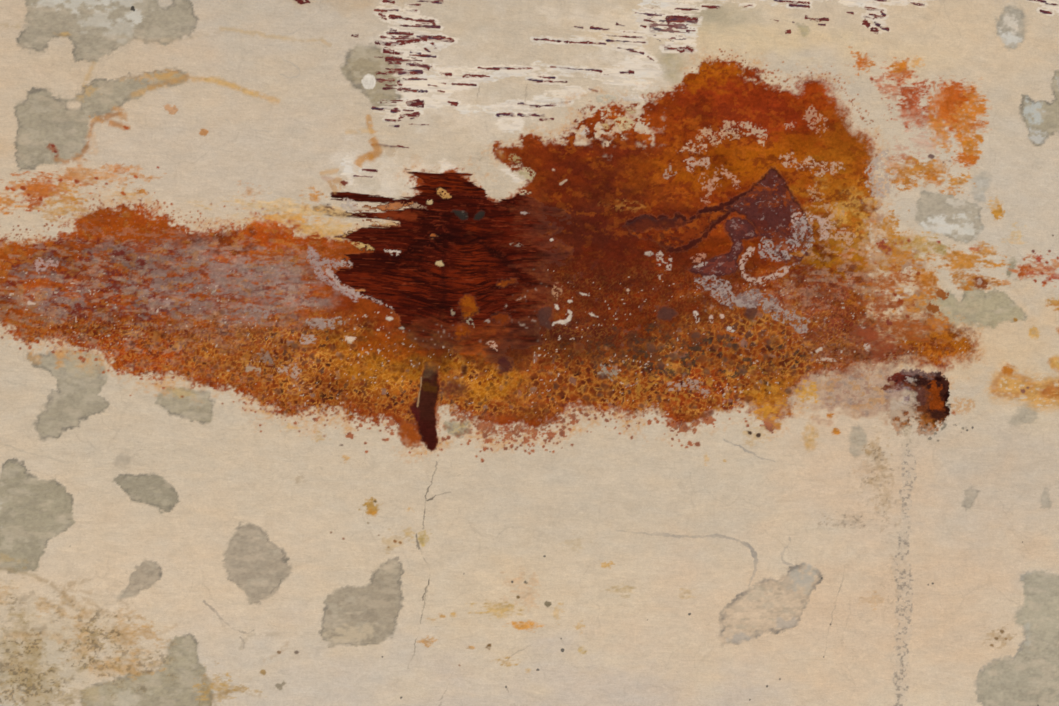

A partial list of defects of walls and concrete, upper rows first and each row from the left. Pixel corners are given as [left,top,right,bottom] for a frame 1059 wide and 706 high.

peeling [12,65,189,173]
peeling [14,0,200,64]
peeling [338,0,935,136]
peeling [1017,69,1059,148]
corrosion [0,45,1059,466]
peeling [23,353,111,444]
peeling [0,457,76,576]
peeling [109,449,182,515]
peeling [220,521,296,605]
peeling [318,556,406,658]
peeling [714,559,827,649]
peeling [971,568,1059,706]